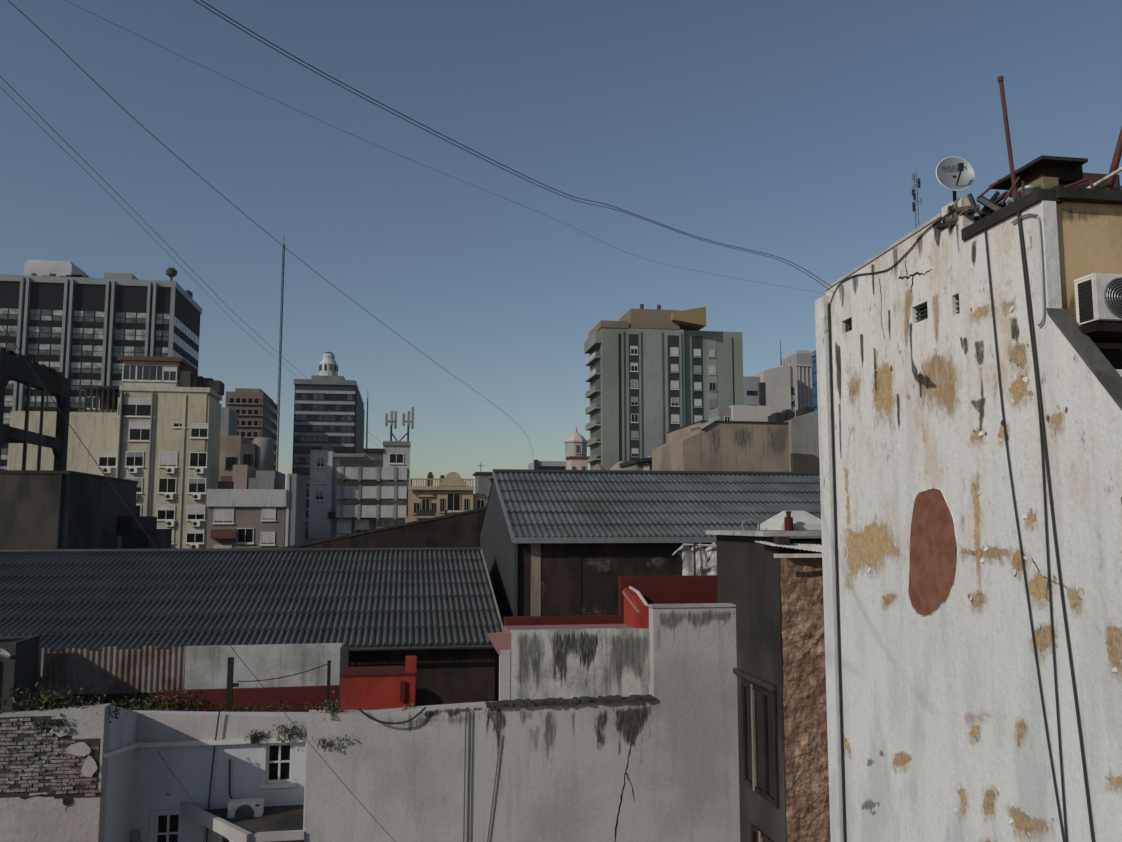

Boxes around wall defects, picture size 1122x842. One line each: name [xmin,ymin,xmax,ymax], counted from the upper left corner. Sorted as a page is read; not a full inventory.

peeling [873,350,892,424]
flaking render [844,469,1057,617]
peeling [1068,587,1084,612]
damp [519,632,598,684]
damp [610,635,645,679]
peeling [1106,626,1122,673]
damp [545,713,555,754]
damp [596,705,648,752]
flaking render [0,716,102,799]
peeling [954,784,967,815]
peeling [983,787,998,814]
peeling [1009,807,1053,840]